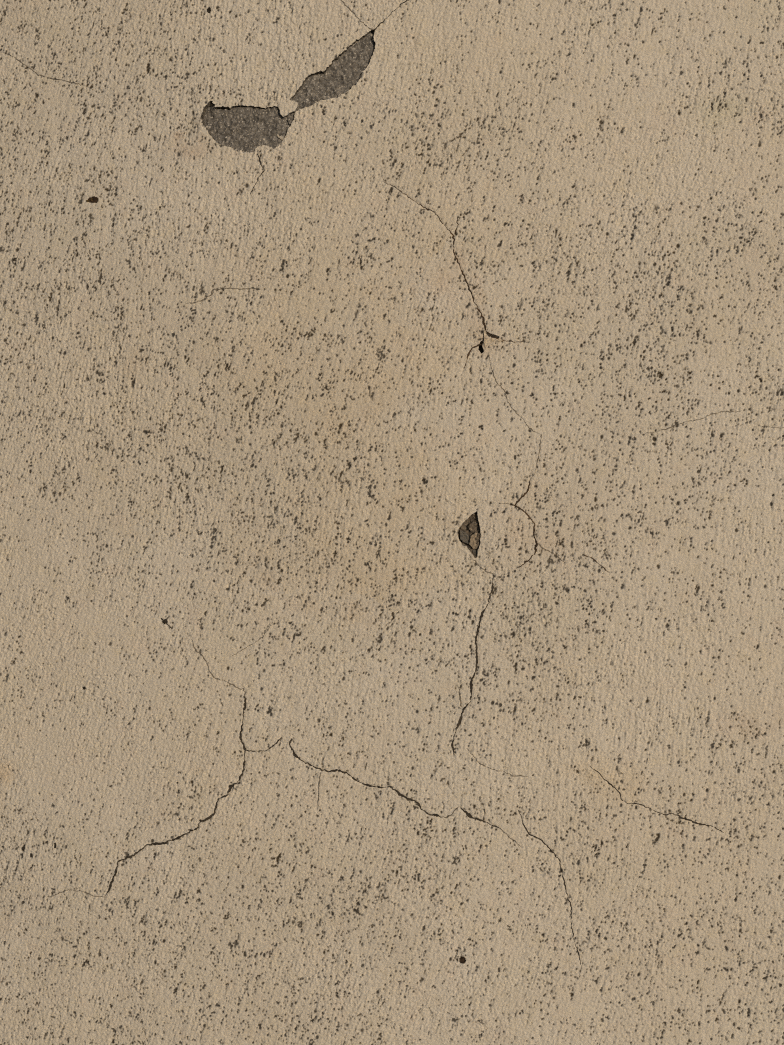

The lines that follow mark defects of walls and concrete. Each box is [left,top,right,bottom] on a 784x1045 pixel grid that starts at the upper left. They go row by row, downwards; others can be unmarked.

peeling [200,30,376,153]
spalling [458,511,481,558]
crack [54,640,582,969]